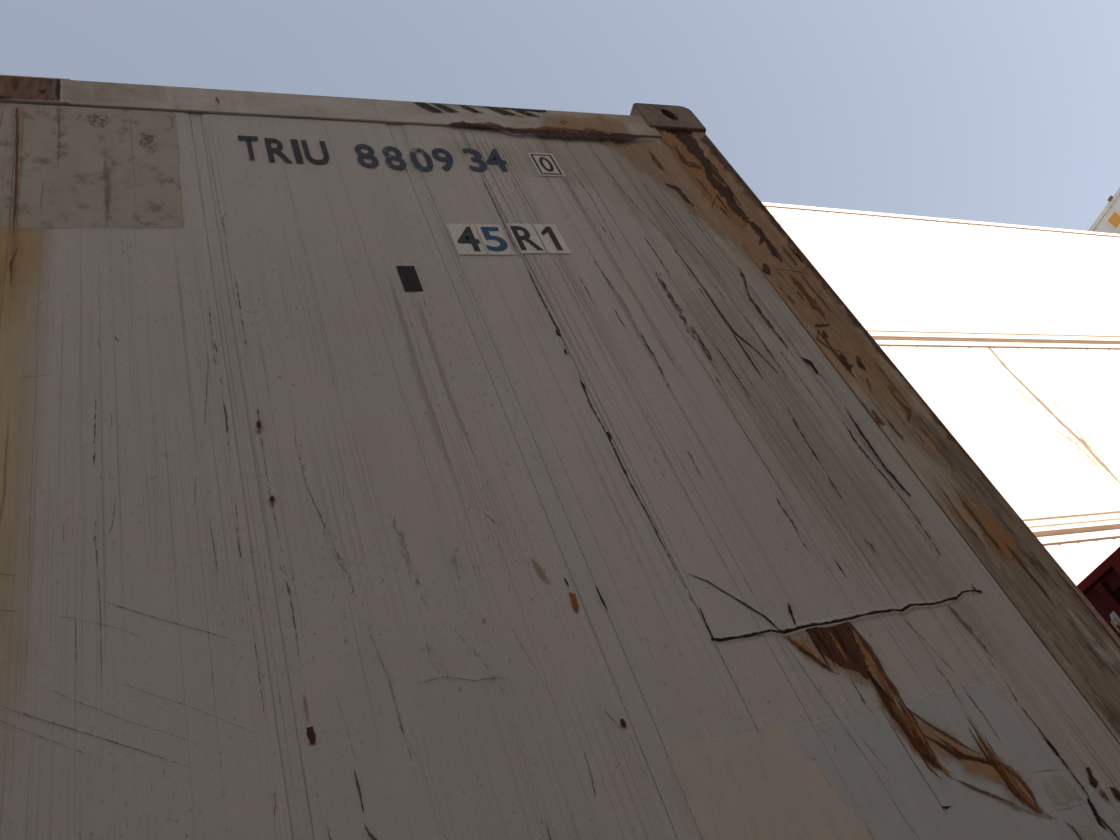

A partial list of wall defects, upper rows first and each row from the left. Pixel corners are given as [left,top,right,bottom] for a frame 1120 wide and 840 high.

rust [0,76,61,229]
rust [449,113,1120,732]
crack [482,167,1118,838]
peeling [888,404,1052,603]
rust [786,622,1052,818]
peeling [1059,574,1120,676]
rust [1086,767,1120,801]